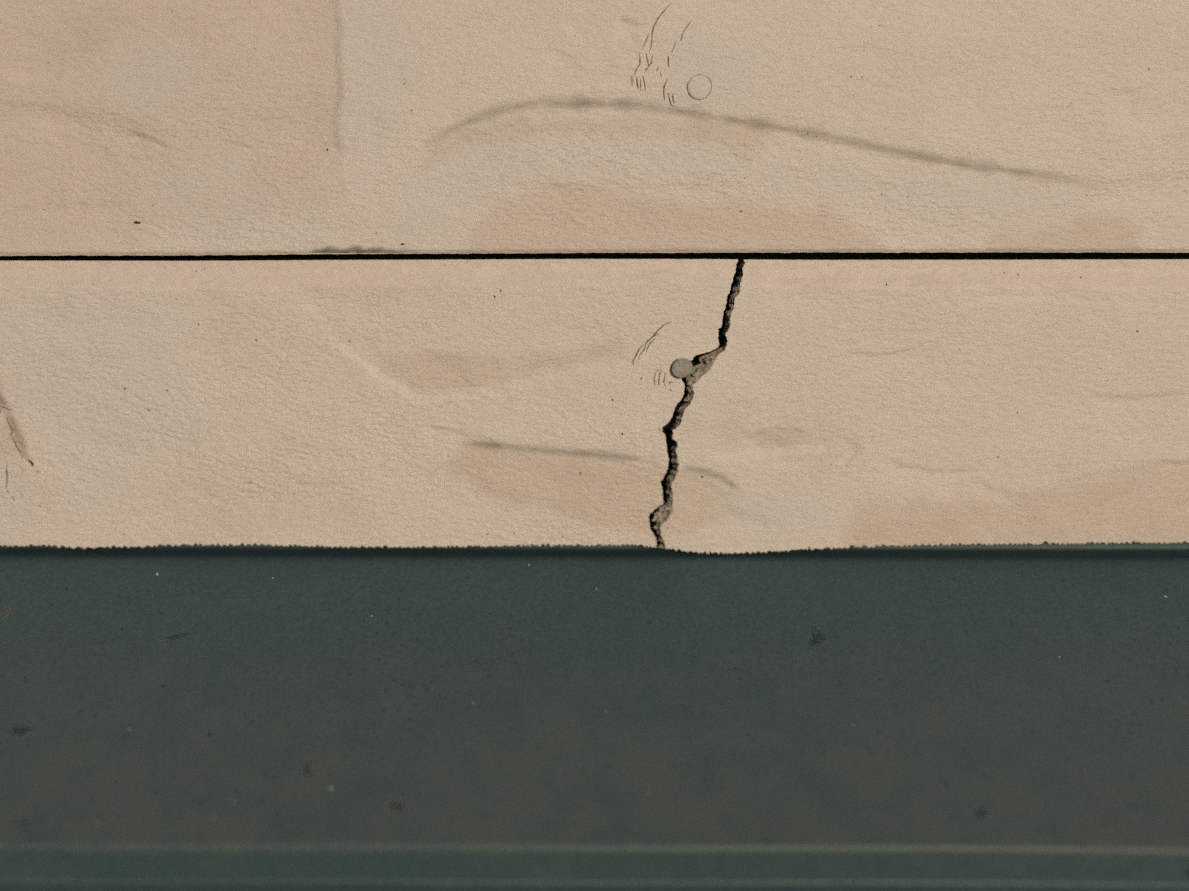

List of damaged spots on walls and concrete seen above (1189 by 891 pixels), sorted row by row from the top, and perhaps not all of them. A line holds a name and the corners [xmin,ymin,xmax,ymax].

crack [632,259,745,550]